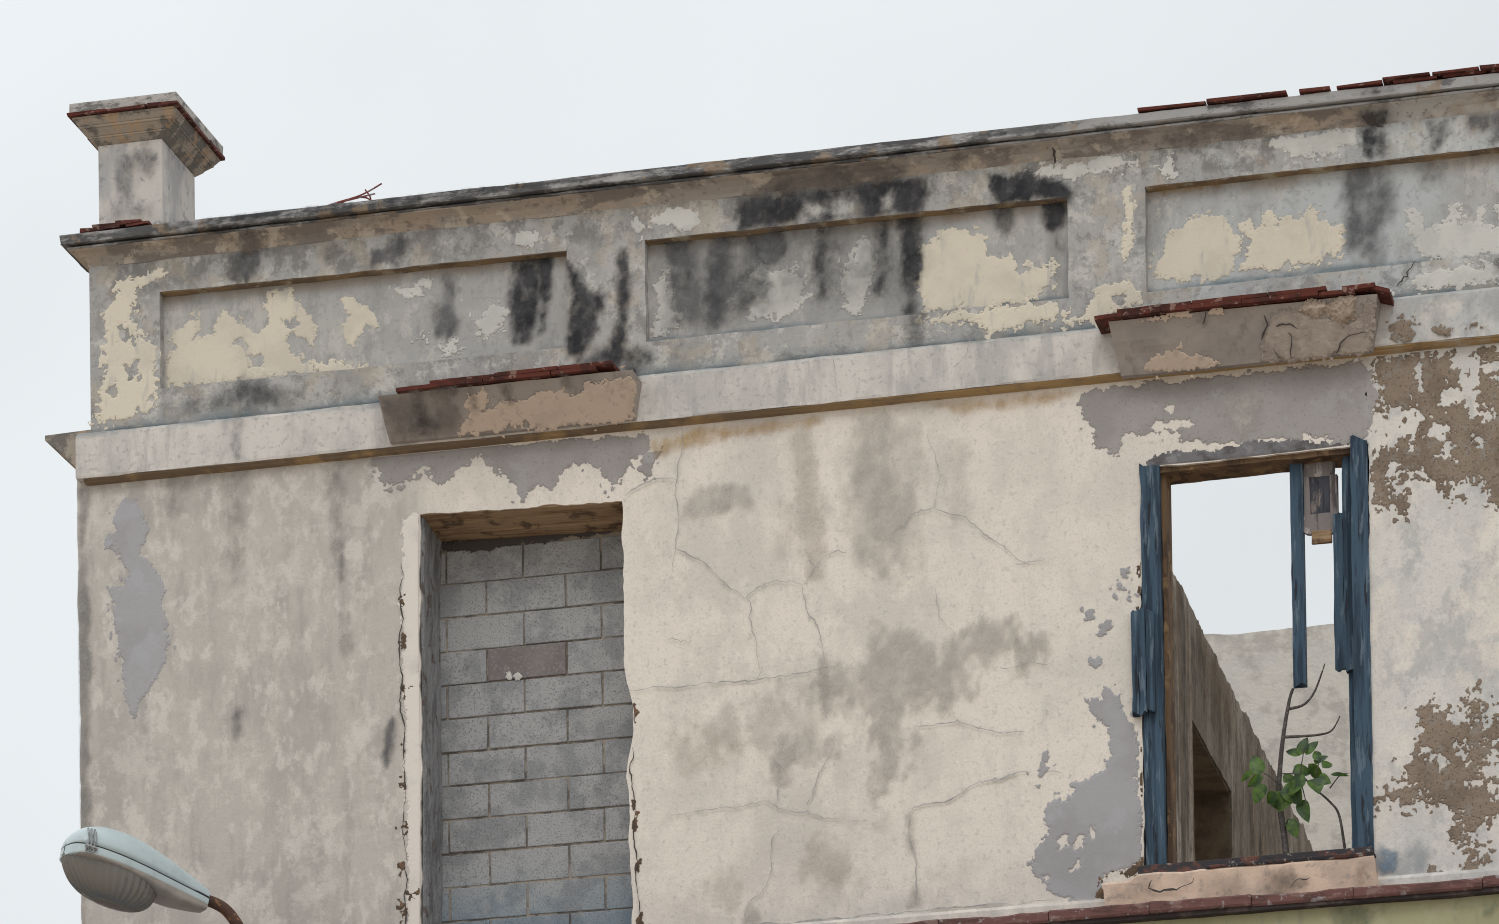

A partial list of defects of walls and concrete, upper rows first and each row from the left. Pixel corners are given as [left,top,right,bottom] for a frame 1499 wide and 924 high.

leakage [509,250,650,375]
leakage [667,168,926,325]
leakage [988,171,1071,230]
flaking render [914,151,1499,523]
crack [1261,315,1298,358]
leakage [1345,89,1390,254]
flaking render [371,365,664,503]
crack [625,429,846,692]
crack [629,752,641,924]
crack [672,756,1061,924]
flaking render [1026,684,1144,902]
flaking render [1373,679,1499,873]